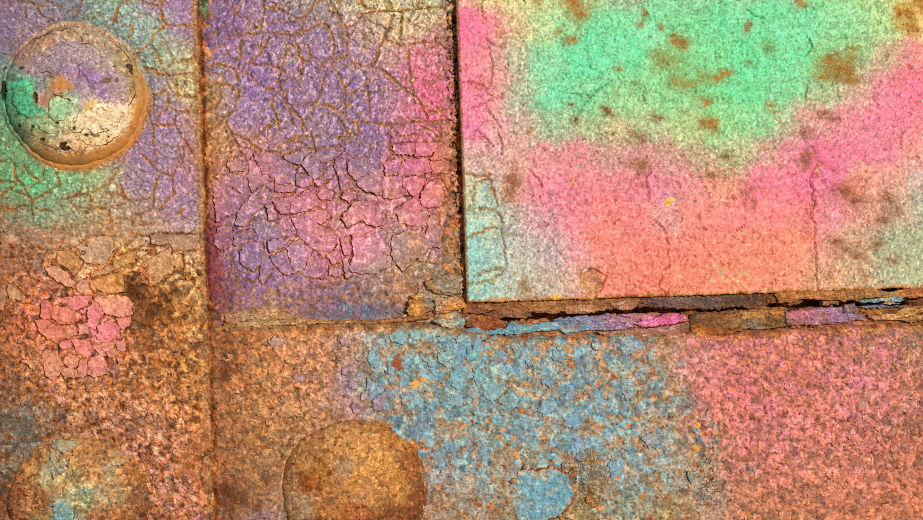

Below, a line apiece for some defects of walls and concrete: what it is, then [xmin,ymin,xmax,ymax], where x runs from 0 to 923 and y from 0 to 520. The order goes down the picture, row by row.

rust [660,25,690,48]
rust [894,0,923,32]
rust [821,46,860,84]
crack [0,0,450,288]
rust [699,117,719,133]
peeling [0,257,25,312]
peeling [34,232,200,381]
peeling [222,274,923,417]
rust [217,340,331,432]
rust [85,383,201,491]
peeling [563,412,585,430]
peeling [607,457,624,479]